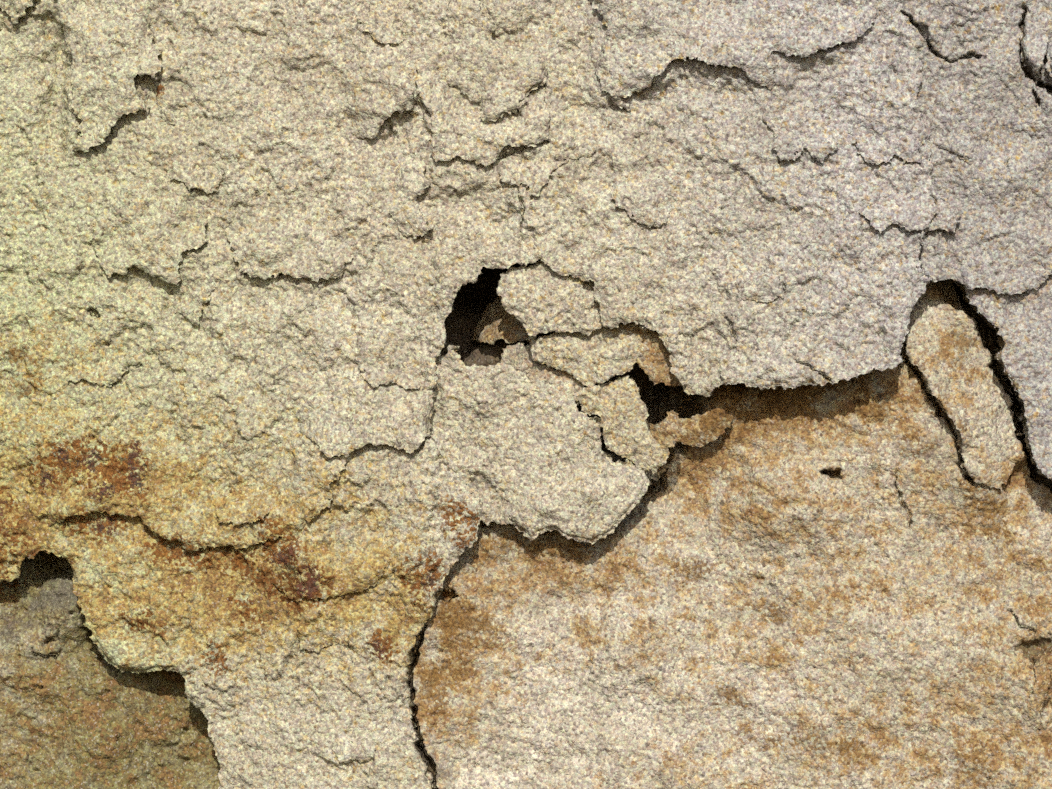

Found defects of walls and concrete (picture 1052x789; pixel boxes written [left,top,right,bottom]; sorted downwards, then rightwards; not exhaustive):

crack [900,10,986,62]
crack [1019,8,1052,105]
spalling [911,278,1005,350]
crack [903,358,975,485]
crack [955,283,1052,490]
corrosion [27,436,160,544]
corrosion [139,513,335,633]
corrosion [397,543,491,648]
corrosion [438,494,603,558]
spalling [409,337,1052,789]
spalling [0,550,221,789]
crack [408,626,439,789]